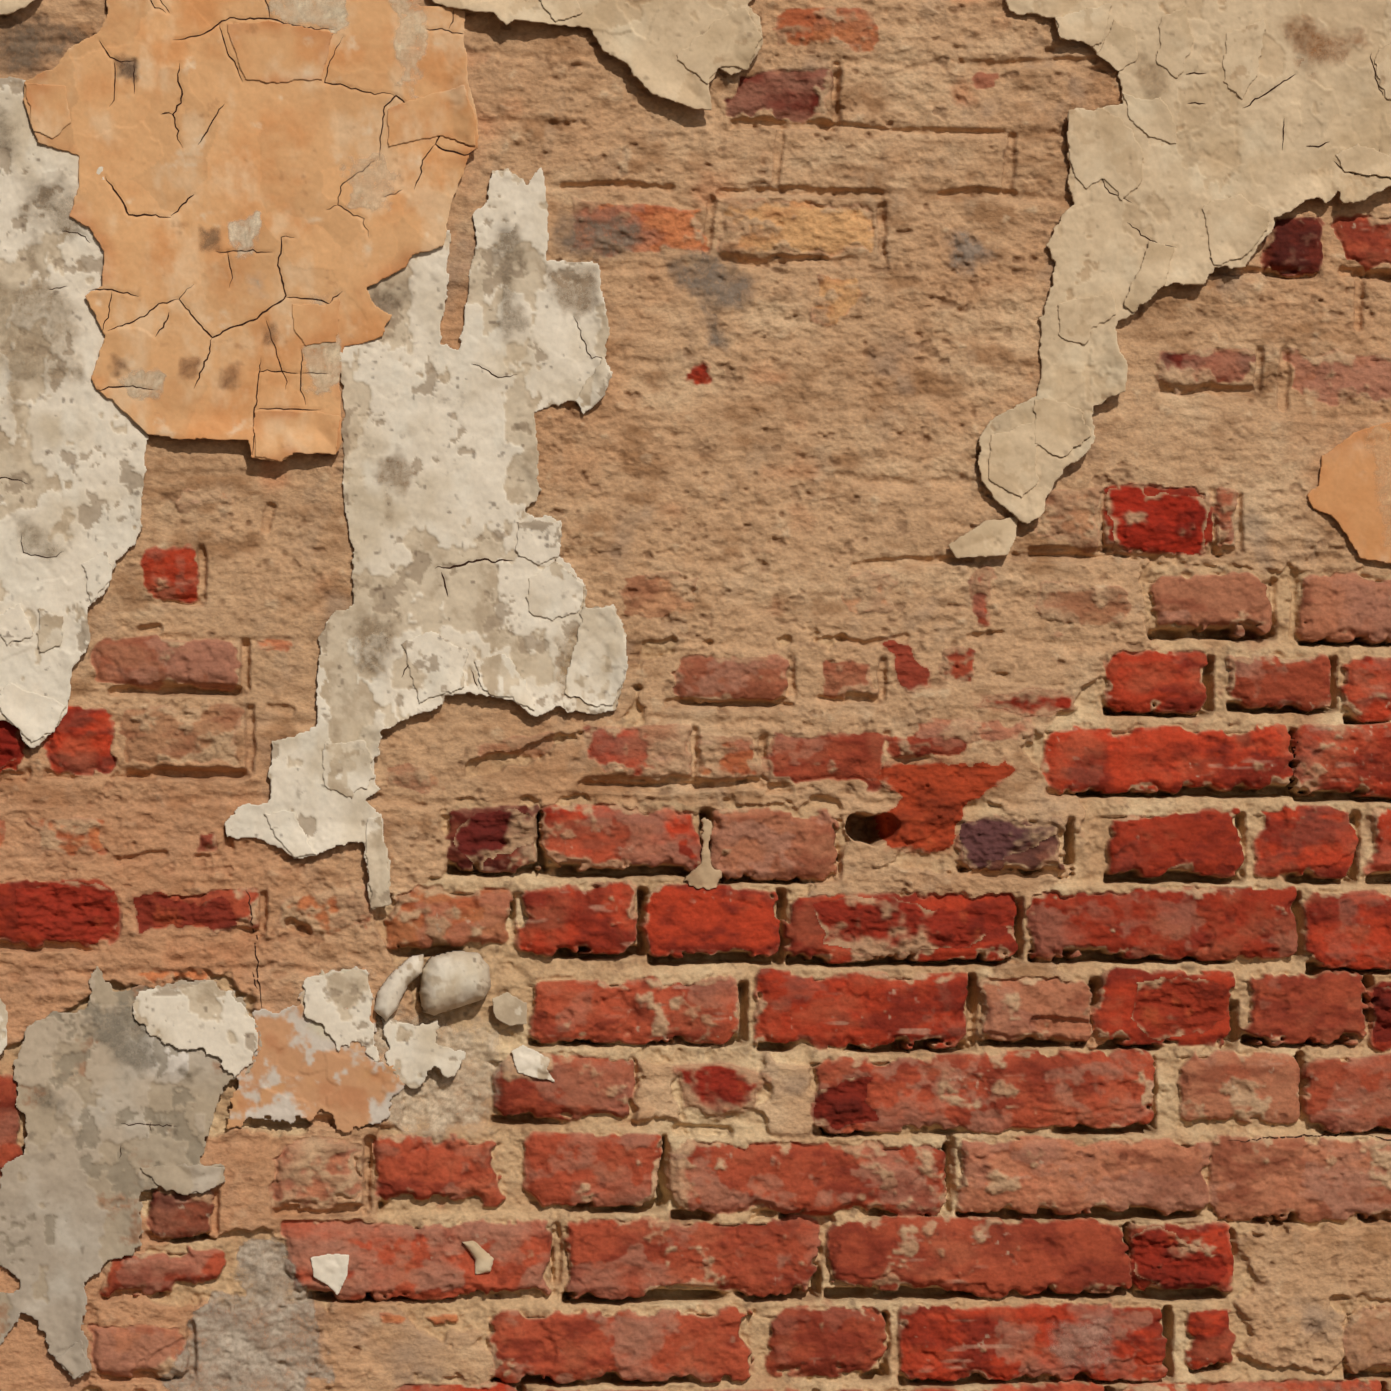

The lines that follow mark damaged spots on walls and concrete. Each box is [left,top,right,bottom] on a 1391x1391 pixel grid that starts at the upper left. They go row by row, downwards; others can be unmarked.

crack [99,40,135,103]
crack [150,0,478,236]
crack [1244,75,1294,108]
crack [1282,123,1380,175]
crack [105,176,193,218]
peeling [948,0,1391,563]
crack [50,236,339,455]
peeling [0,0,763,909]
peeling [492,992,527,1026]
peeling [511,1045,555,1082]
peeling [0,966,466,1380]
peeling [462,1241,494,1274]